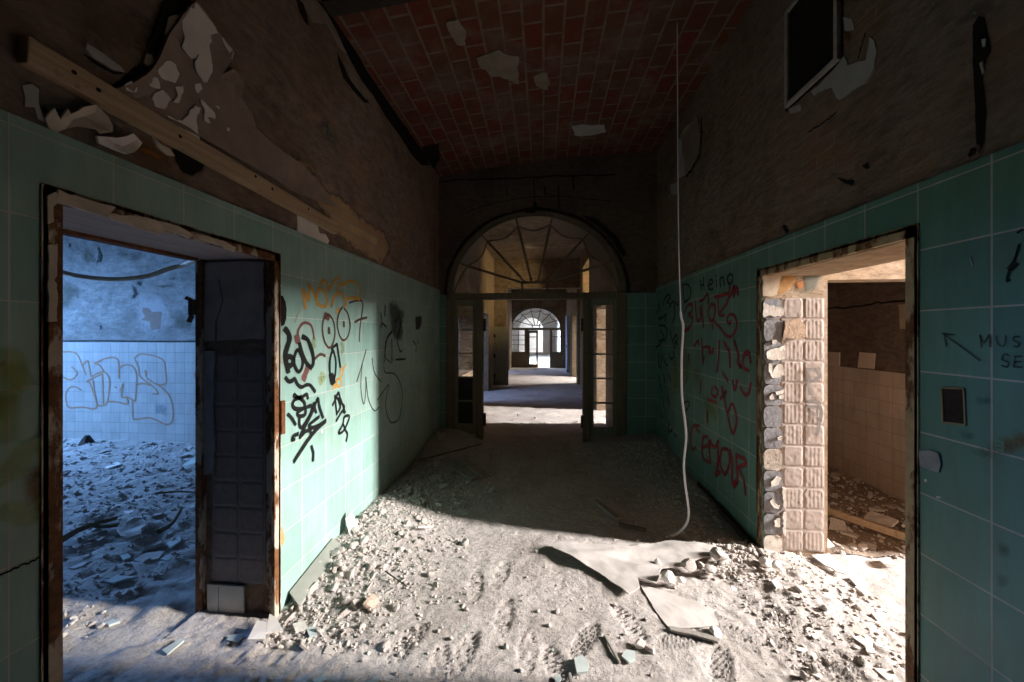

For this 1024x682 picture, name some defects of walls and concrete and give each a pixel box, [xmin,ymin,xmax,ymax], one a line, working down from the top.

peeling [21,84,175,156]
peeling [83,1,390,266]
peeling [811,17,878,100]
peeling [46,189,266,585]
peeling [762,298,825,552]